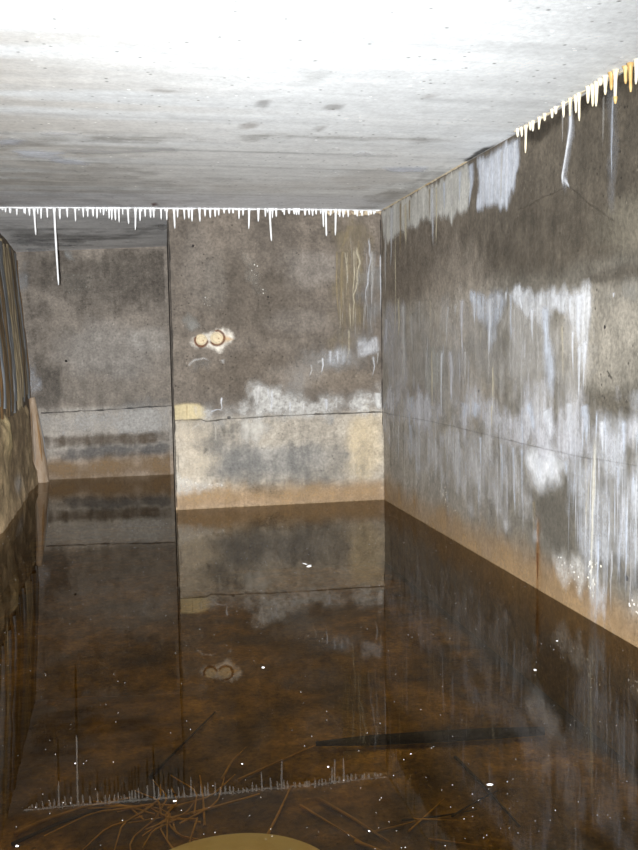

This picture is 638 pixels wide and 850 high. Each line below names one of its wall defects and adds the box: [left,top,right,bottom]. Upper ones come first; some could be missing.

leakage [513,90,590,186]
leakage [120,142,519,293]
rust [193,329,233,352]
leakage [446,293,491,375]
leakage [514,286,590,372]
leakage [242,386,333,440]
leakage [350,351,452,470]
leakage [463,368,587,491]
leakage [429,493,482,557]
leakage [492,416,620,635]